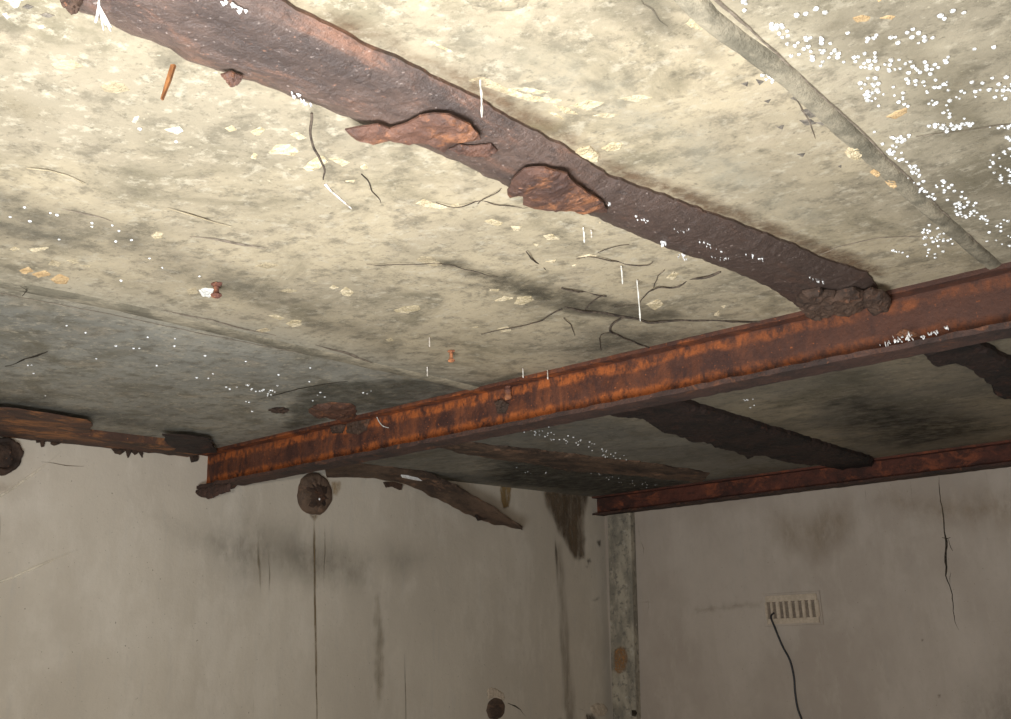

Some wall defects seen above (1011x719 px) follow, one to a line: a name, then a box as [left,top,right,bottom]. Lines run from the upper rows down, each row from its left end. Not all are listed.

corrosion [60,0,83,15]
corrosion [220,70,243,87]
corrosion [469,82,552,130]
corrosion [345,112,498,158]
corrosion [507,166,607,215]
corrosion [612,167,879,275]
corrosion [112,448,143,458]
corrosion [195,483,231,499]
corrosion [383,481,403,490]
corrosion [501,487,511,508]
crack [939,486,958,628]